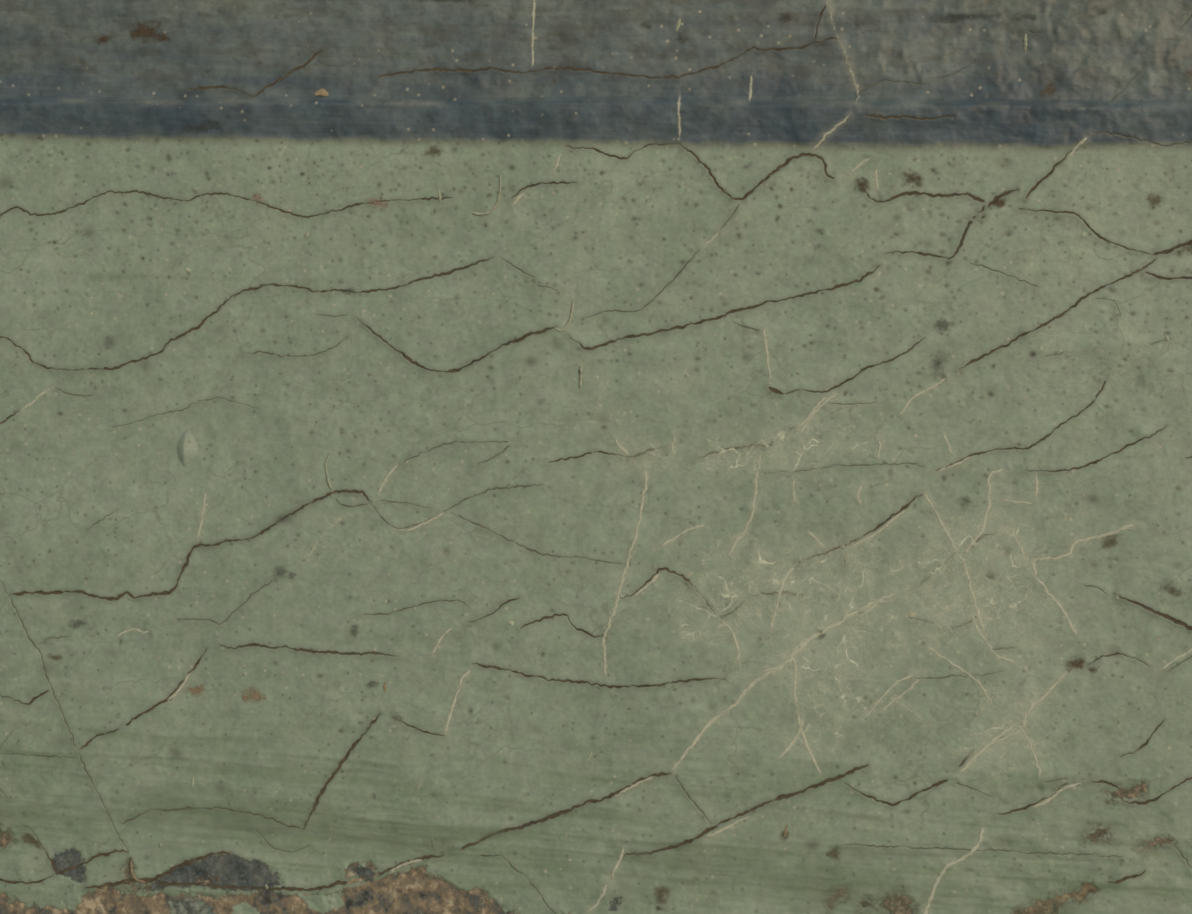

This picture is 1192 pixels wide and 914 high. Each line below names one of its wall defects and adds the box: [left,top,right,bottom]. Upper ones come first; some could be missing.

crack [186,3,858,100]
crack [865,111,956,124]
crack [0,116,1192,555]
crack [0,422,1192,914]
peeling [0,848,519,914]